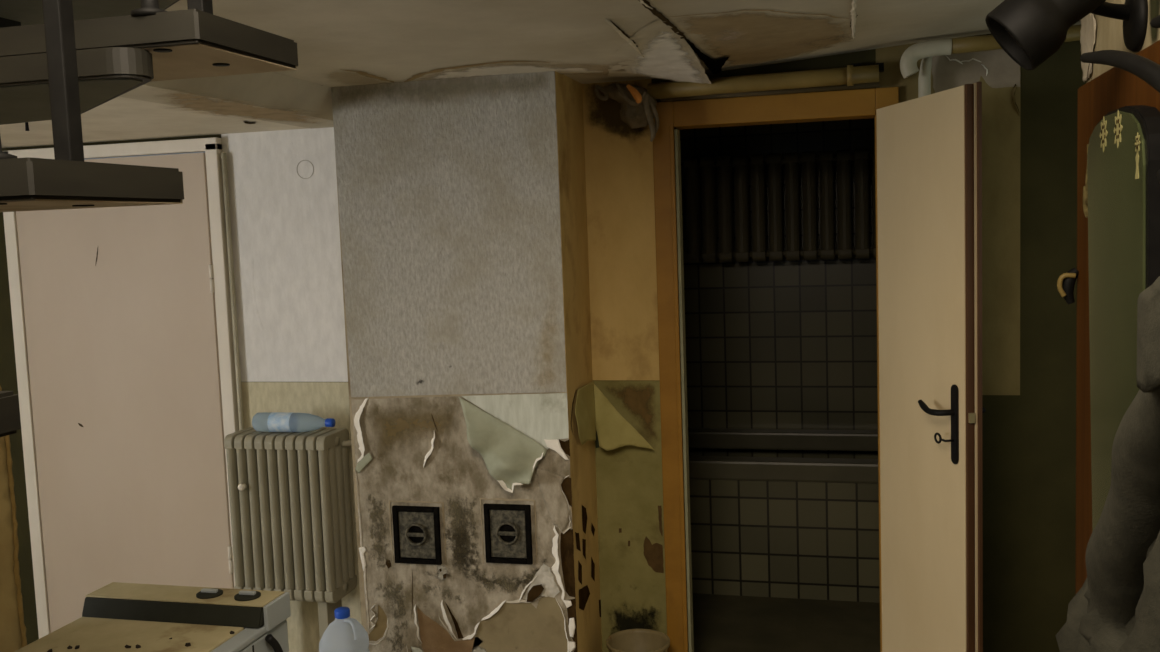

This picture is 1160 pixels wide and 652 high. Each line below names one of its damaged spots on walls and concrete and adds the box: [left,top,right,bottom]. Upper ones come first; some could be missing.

crack [605,19,644,57]
crack [638,0,696,47]
crack [850,0,858,39]
flaking render [355,468,389,645]
flaking render [406,469,601,652]